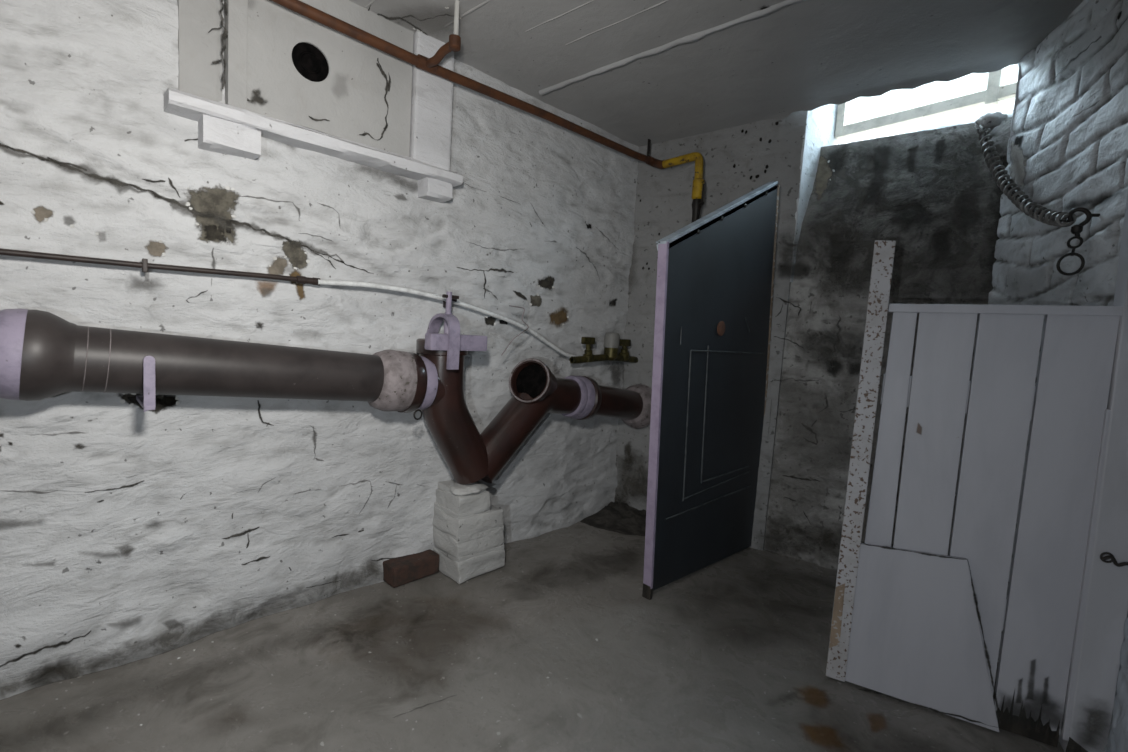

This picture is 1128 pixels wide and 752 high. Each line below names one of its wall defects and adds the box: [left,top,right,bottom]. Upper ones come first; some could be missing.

crack [208,0,228,89]
crack [359,58,391,140]
peeling [31,206,74,228]
peeling [146,240,166,257]
crack [0,143,373,303]
spalling [185,186,239,243]
spalling [268,241,310,275]
water stain [779,135,1008,303]
crack [0,631,91,675]
water stain [1001,660,1062,727]